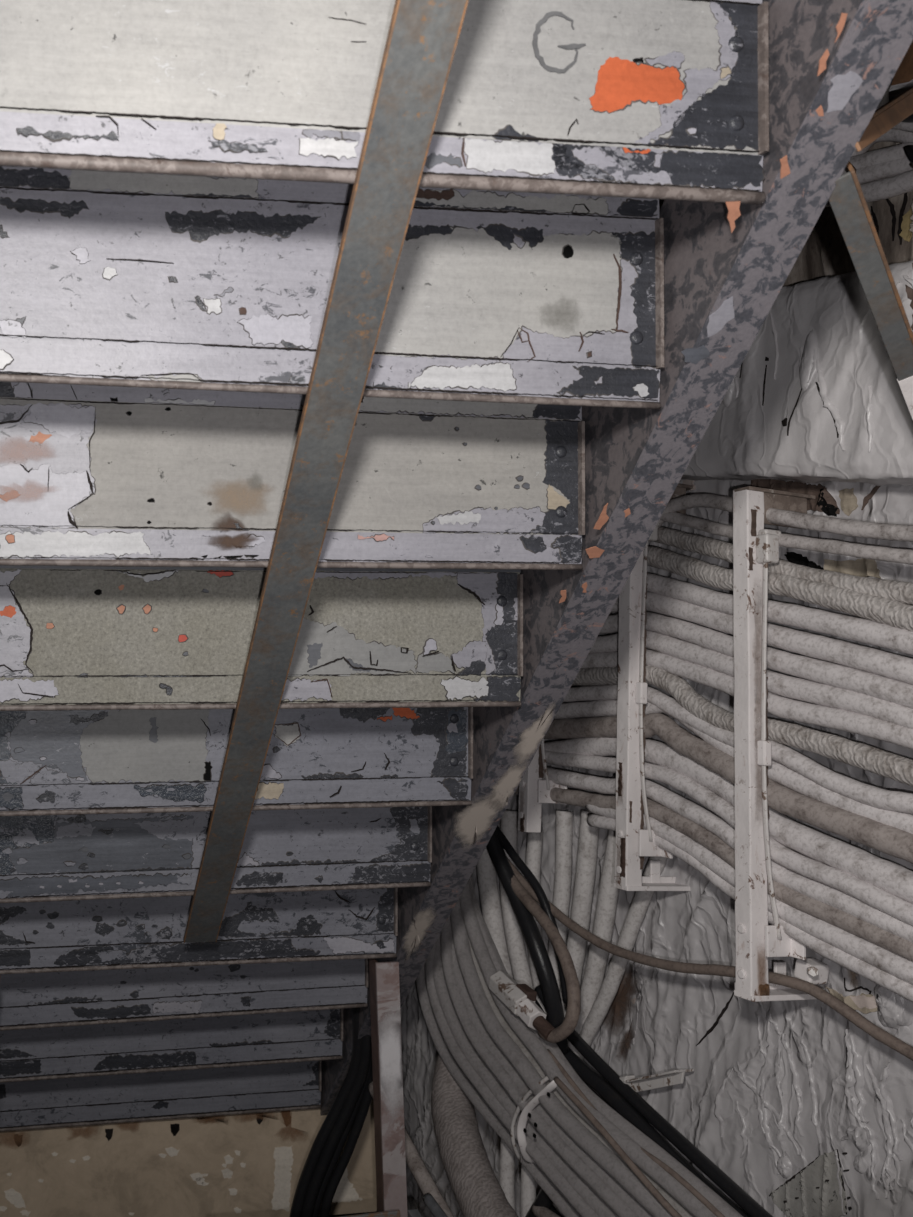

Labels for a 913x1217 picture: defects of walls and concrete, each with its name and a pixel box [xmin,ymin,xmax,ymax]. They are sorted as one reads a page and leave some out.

peeling [816,13,863,116]
peeling [16,115,119,142]
peeling [209,123,268,153]
peeling [299,129,360,161]
peeling [425,2,764,233]
peeling [0,166,320,243]
peeling [237,307,313,351]
peeling [191,486,266,578]
corrosion [183,0,469,943]
peeling [281,188,660,845]
peeling [0,316,216,967]
peeling [54,806,434,979]